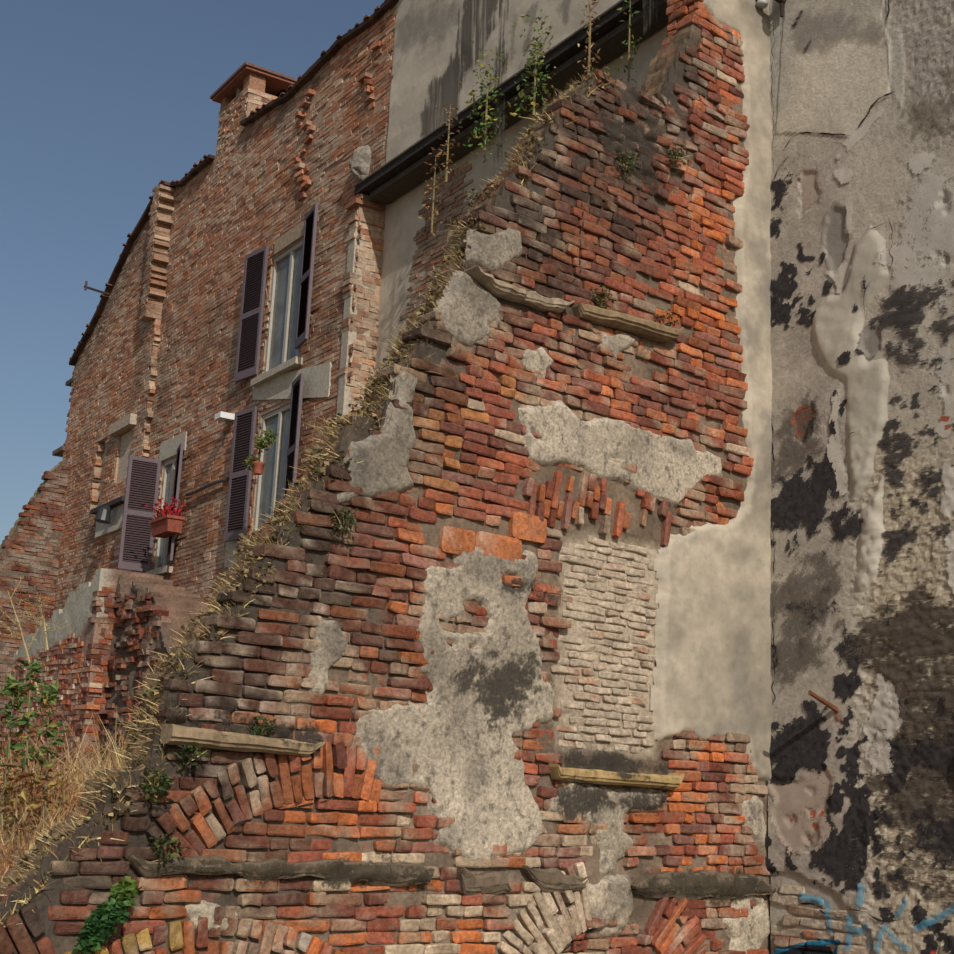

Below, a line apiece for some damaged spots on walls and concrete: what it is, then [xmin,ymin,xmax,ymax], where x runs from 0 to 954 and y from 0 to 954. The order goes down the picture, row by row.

spalling [349,145,371,182]
damp [421,0,509,136]
crack [771,31,895,180]
flaking render [433,228,523,347]
flaking render [520,345,553,378]
flaking render [598,333,635,360]
flaking render [335,364,418,506]
flaking render [518,400,722,509]
flaking render [650,0,903,924]
flaking render [308,619,348,696]
flaking render [352,544,662,937]
flaking render [718,895,770,954]